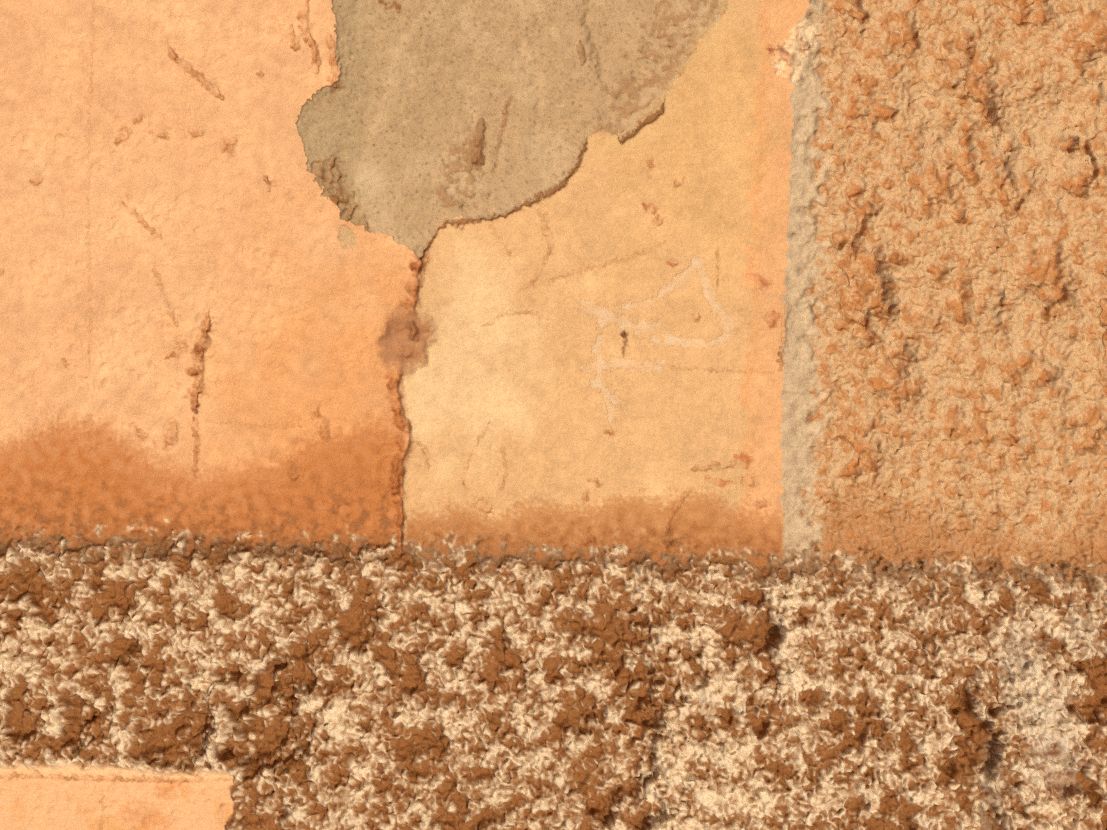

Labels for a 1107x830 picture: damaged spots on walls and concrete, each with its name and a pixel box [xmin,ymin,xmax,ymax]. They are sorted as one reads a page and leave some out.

spalling [307,155,373,233]
crack [399,142,666,326]
peeling [642,203,664,226]
crack [379,370,430,562]